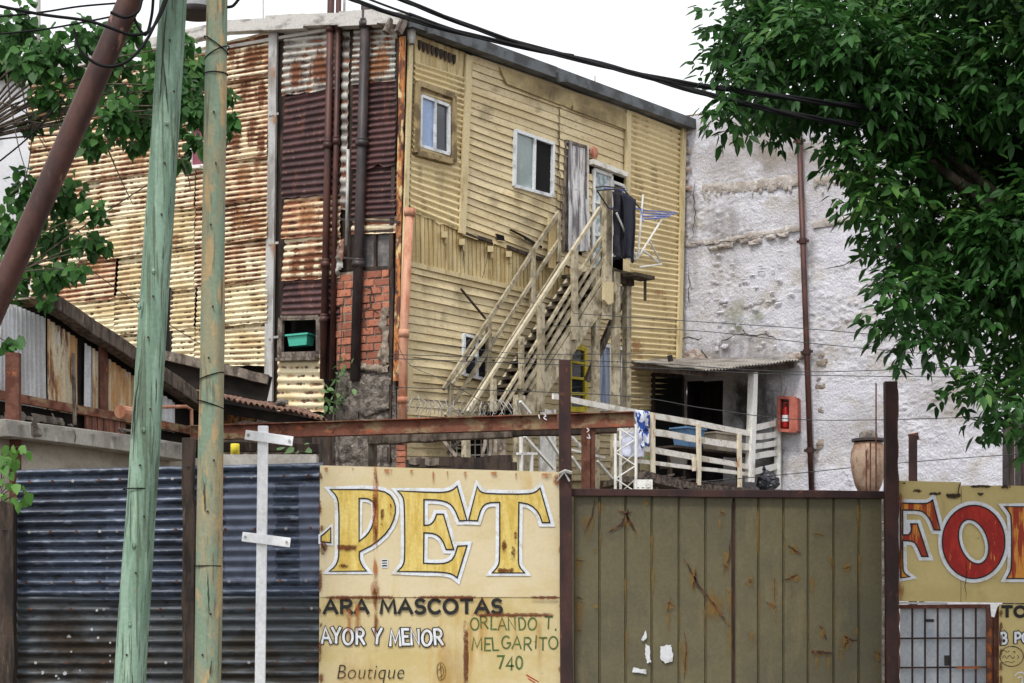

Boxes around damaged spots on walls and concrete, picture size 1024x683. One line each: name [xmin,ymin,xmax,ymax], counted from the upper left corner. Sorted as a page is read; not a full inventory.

rust [289,49,326,88]
rust [369,47,389,77]
rust [227,42,274,184]
rust [289,236,332,275]